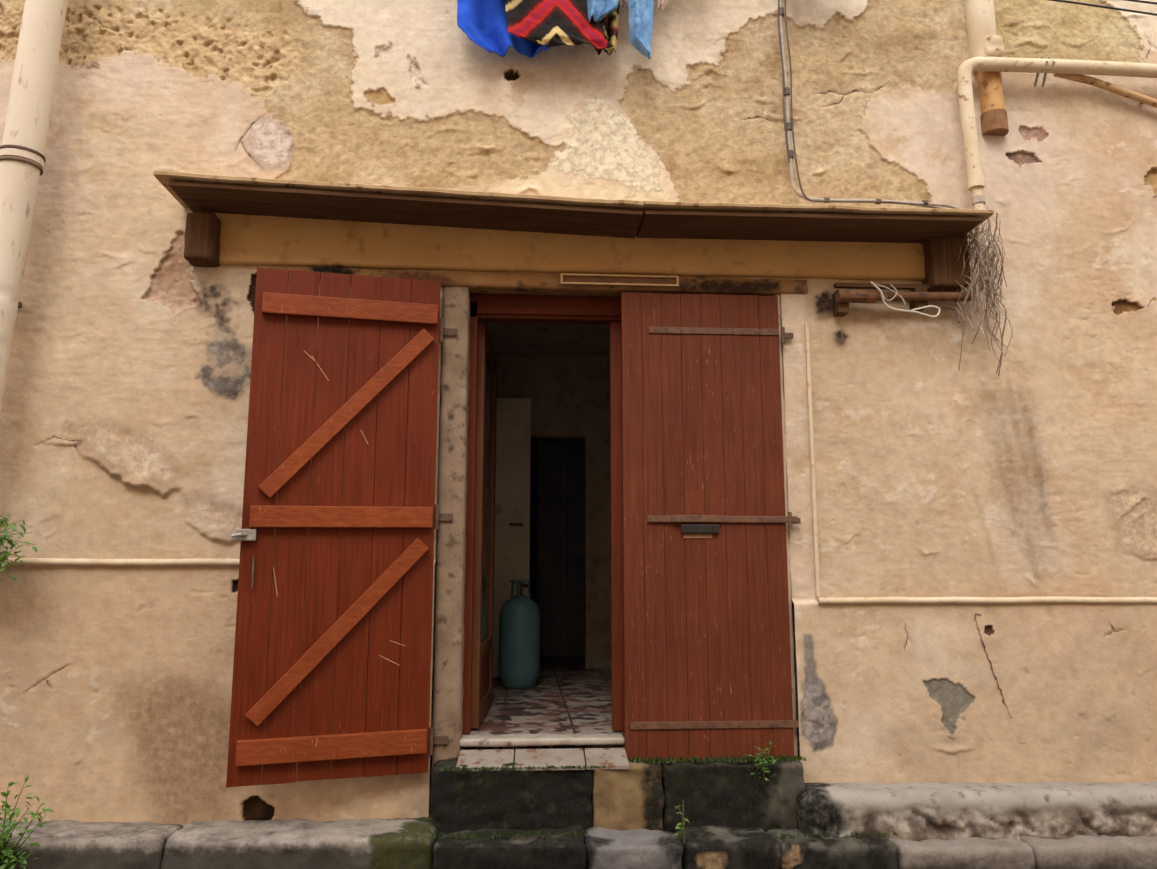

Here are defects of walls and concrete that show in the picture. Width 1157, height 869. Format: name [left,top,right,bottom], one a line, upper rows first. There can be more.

peeling [0,0,25,59]
peeling [59,0,973,208]
flaking render [1006,126,1048,165]
flaking render [1144,170,1157,197]
flaking render [141,231,201,314]
flaking render [1111,300,1141,314]
leakage [198,285,251,399]
peeling [924,679,975,738]